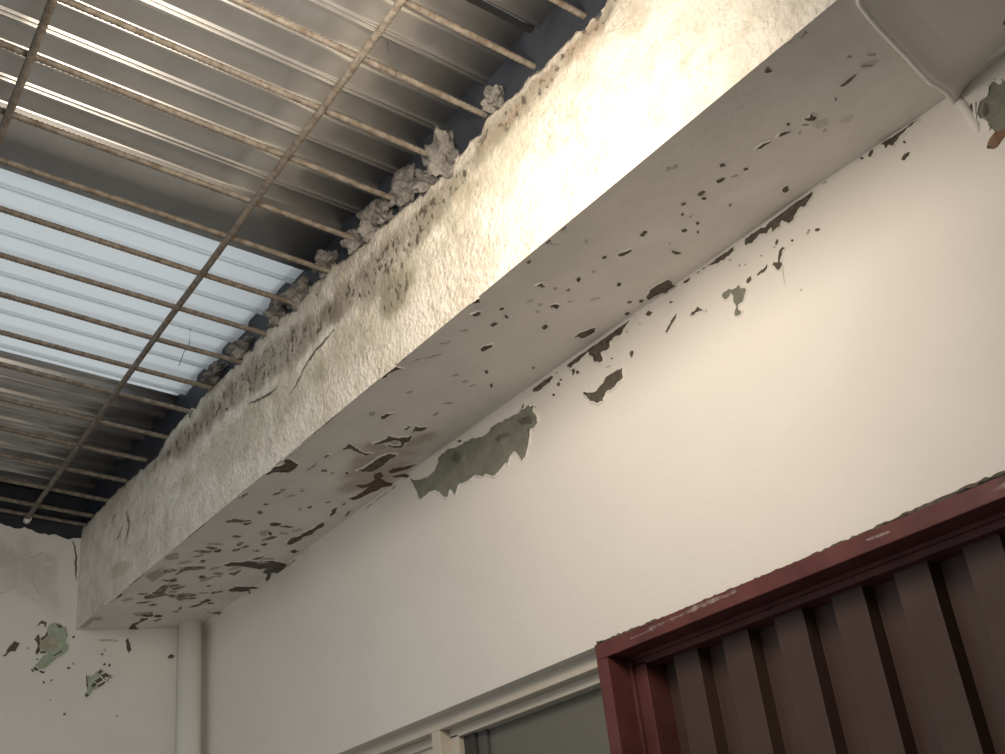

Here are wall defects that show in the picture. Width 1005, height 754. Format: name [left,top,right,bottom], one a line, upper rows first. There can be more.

leakage [477,43,576,148]
peeling [753,111,818,150]
peeling [860,118,922,160]
peeling [970,68,1005,149]
leakage [346,161,473,311]
leakage [167,306,331,456]
peeling [83,191,814,699]
peeling [1,617,102,684]